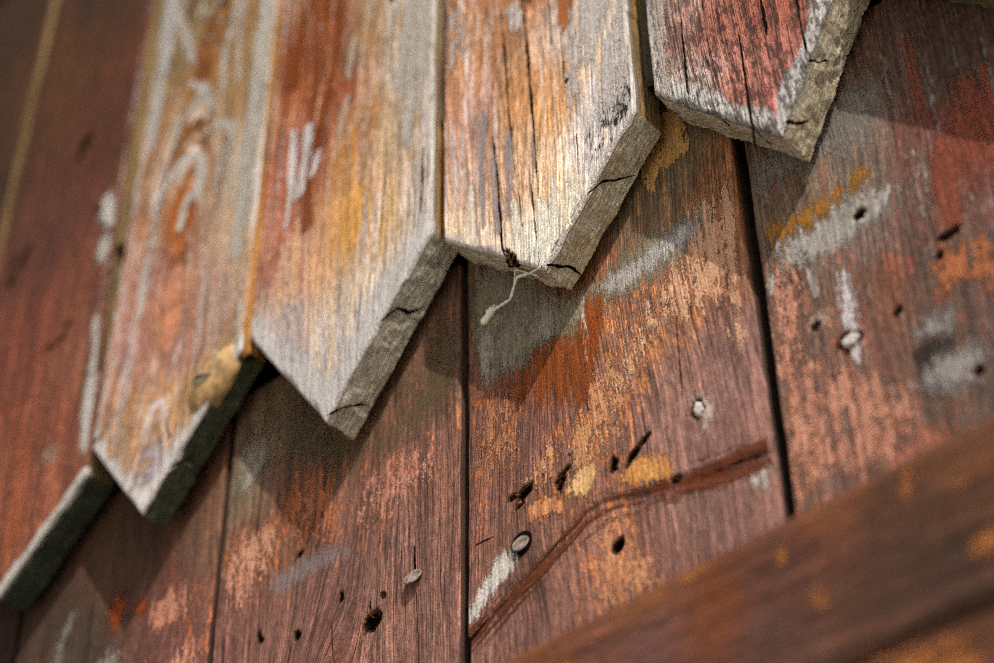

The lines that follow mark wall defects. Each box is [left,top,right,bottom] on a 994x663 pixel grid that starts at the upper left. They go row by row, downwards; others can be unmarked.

crack [492,0,582,281]
peeling [640,109,690,193]
crack [681,3,703,106]
crack [718,31,771,149]
crack [760,0,768,34]
peeling [761,164,871,248]
peeling [930,231,994,301]
peeling [515,173,748,523]
peeling [771,258,919,485]
peeling [476,388,527,485]
peeling [147,579,194,633]
crack [467,531,566,646]